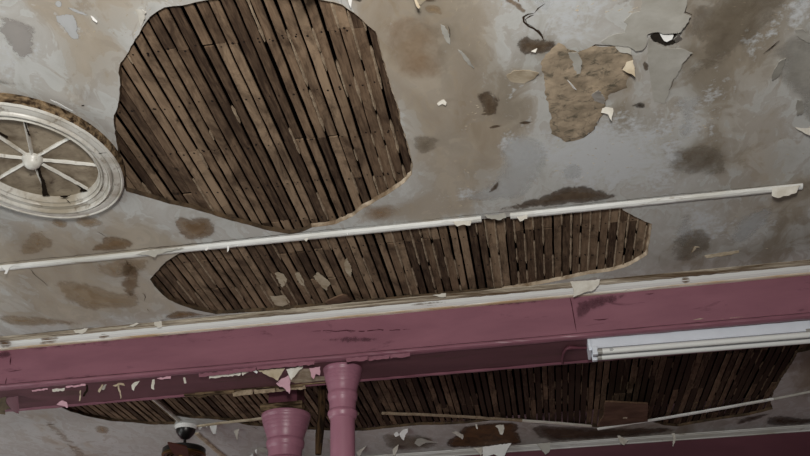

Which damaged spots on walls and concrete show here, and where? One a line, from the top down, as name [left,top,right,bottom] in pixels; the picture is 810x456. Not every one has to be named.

crack [518,0,544,41]
flaking render [506,0,692,142]
flaking render [114,0,652,314]
water stain [512,186,614,209]
water stain [176,218,213,239]
water stain [66,263,138,306]
flaking render [32,381,269,441]
peeling [199,361,330,443]
flaking render [346,344,810,456]